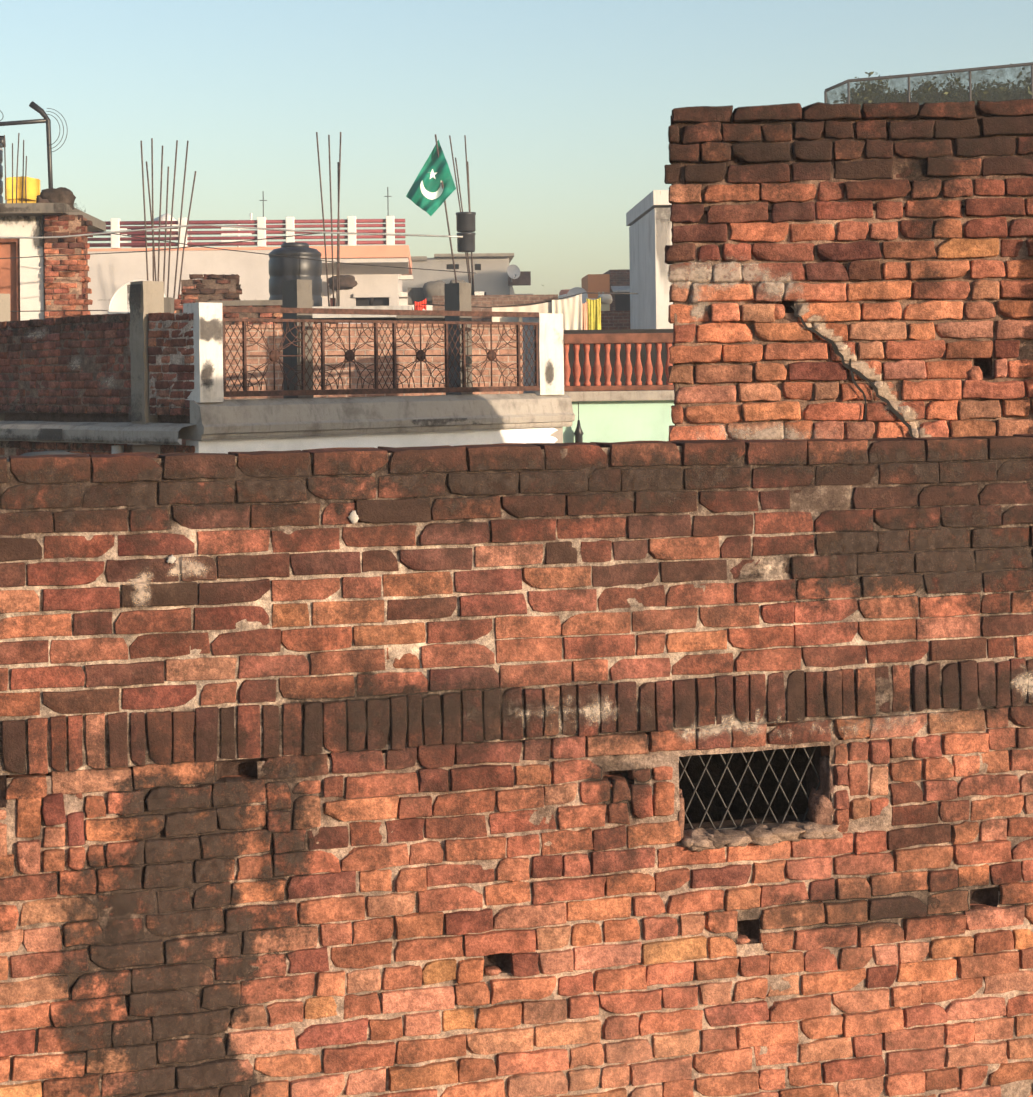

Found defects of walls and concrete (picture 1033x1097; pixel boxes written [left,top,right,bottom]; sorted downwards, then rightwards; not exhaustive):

damp [1,216,43,247]
crack [791,299,931,438]